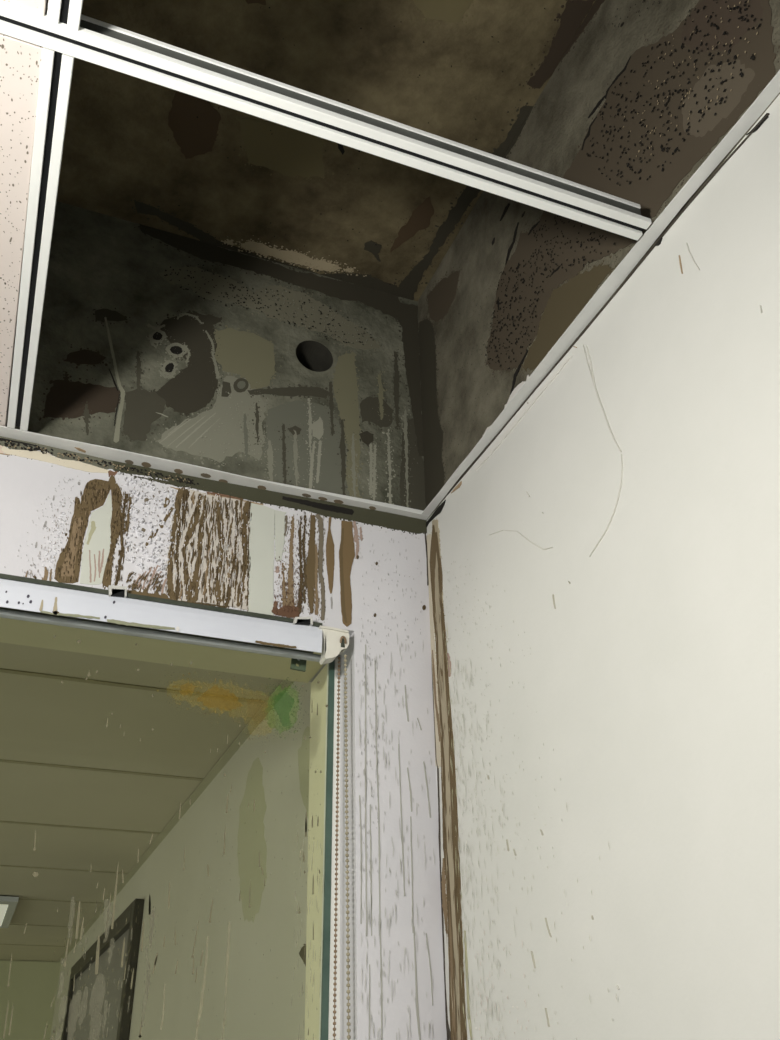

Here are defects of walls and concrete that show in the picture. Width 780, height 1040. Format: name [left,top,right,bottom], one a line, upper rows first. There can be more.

leakage [488,100,536,160]
leakage [519,256,618,378]
corrosion [89,550,100,583]
corrosion [128,565,167,594]
corrosion [352,521,363,559]
leakage [298,726,310,817]
leakage [358,632,409,882]
leakage [415,518,520,1040]
leakage [237,757,267,923]